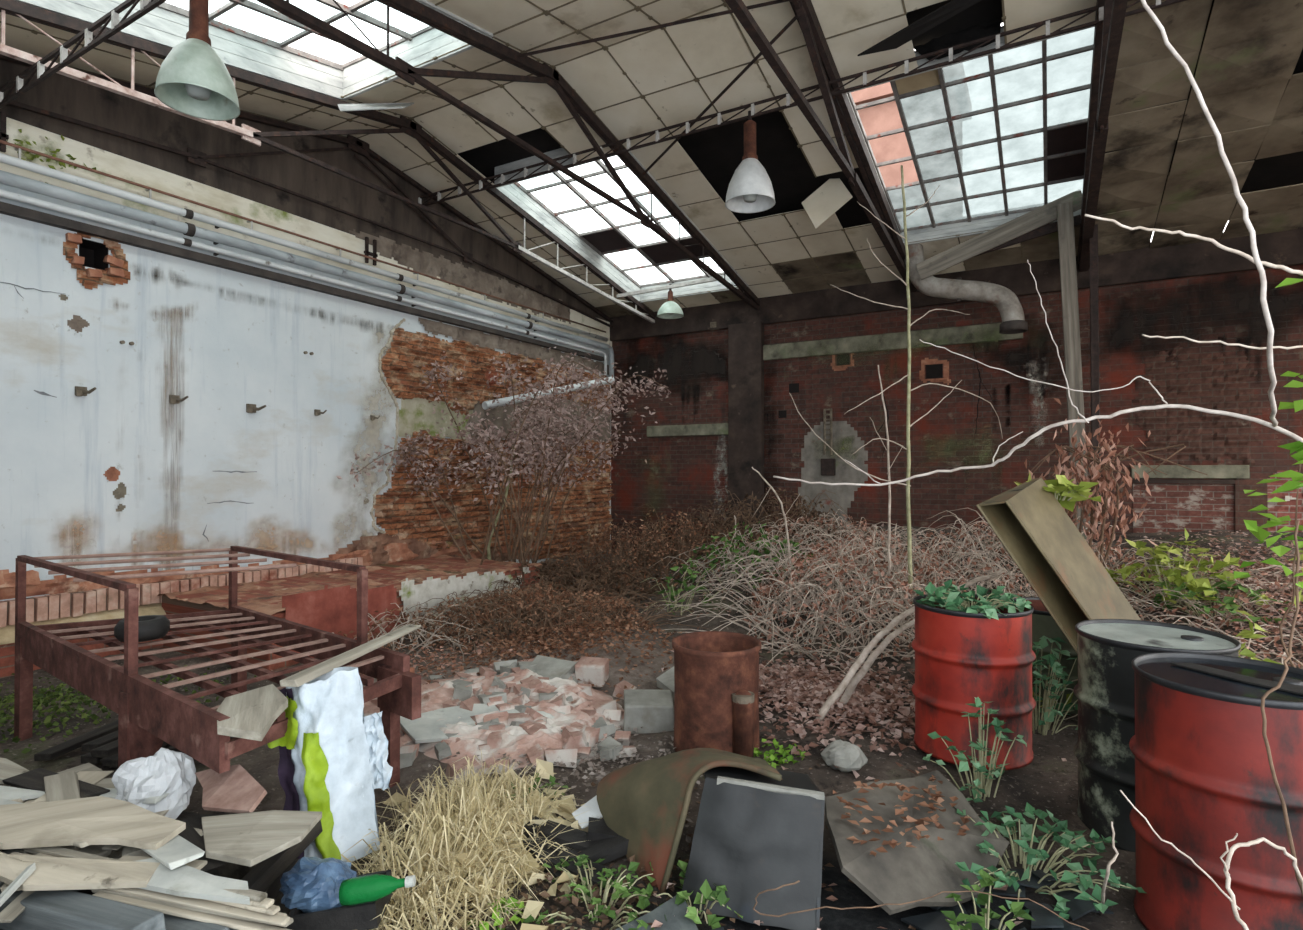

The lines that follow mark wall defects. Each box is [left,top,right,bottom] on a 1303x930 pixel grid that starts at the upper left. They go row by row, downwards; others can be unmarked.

spalling [63,232,130,290]
flaking render [58,294,90,337]
flaking render [0,317,614,640]